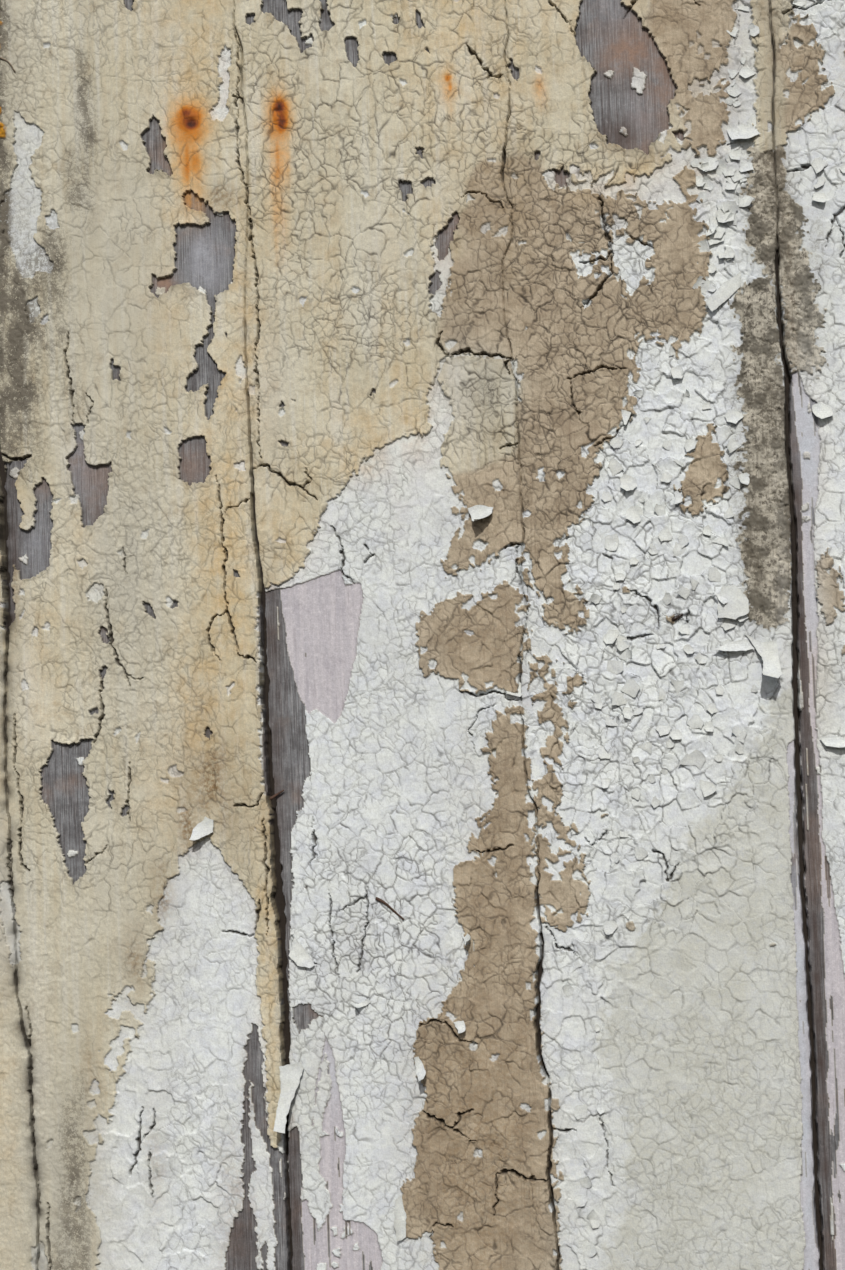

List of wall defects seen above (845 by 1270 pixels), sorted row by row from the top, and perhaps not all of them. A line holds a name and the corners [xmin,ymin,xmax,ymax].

rust [159,84,220,227]
peeling [150,191,246,420]
rust [258,76,301,275]
crack [249,208,313,491]
crack [580,192,654,310]
peeling [5,461,54,580]
crack [206,475,259,664]
crack [435,0,625,1270]
peeling [544,0,845,1270]
peeling [39,739,94,886]
crack [221,792,370,977]
peeling [85,353,536,1270]